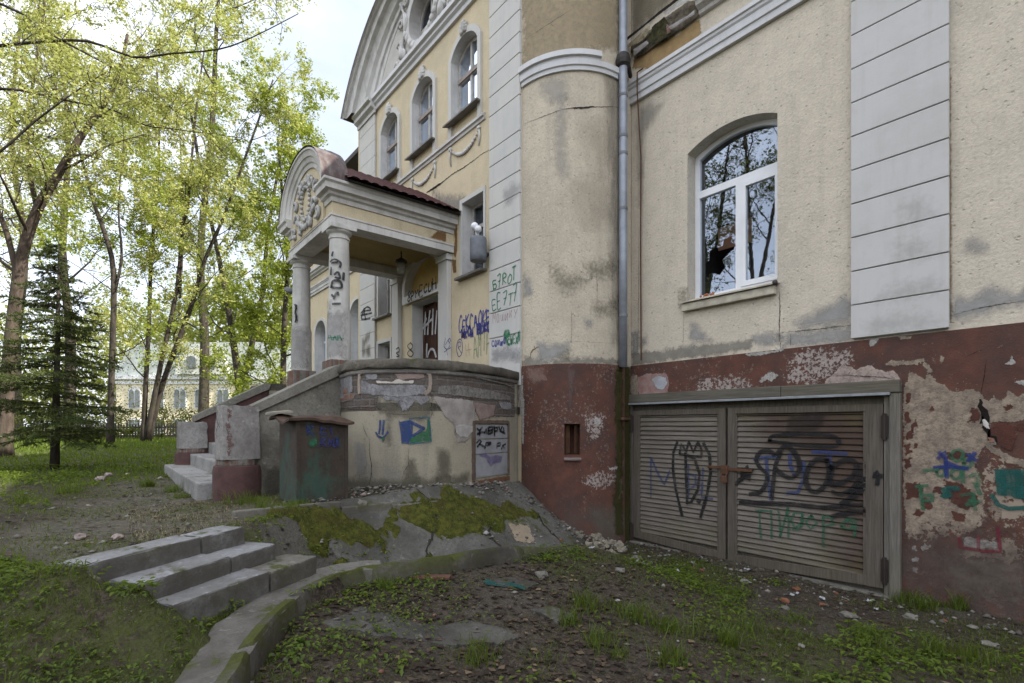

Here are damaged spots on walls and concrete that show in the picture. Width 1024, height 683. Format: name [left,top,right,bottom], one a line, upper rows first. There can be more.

crack [526,106,612,123]
flaking render [340,367,548,444]
peeling [630,373,670,394]
water stain [493,298,851,543]
peeling [698,344,1024,573]
crack [970,350,997,445]